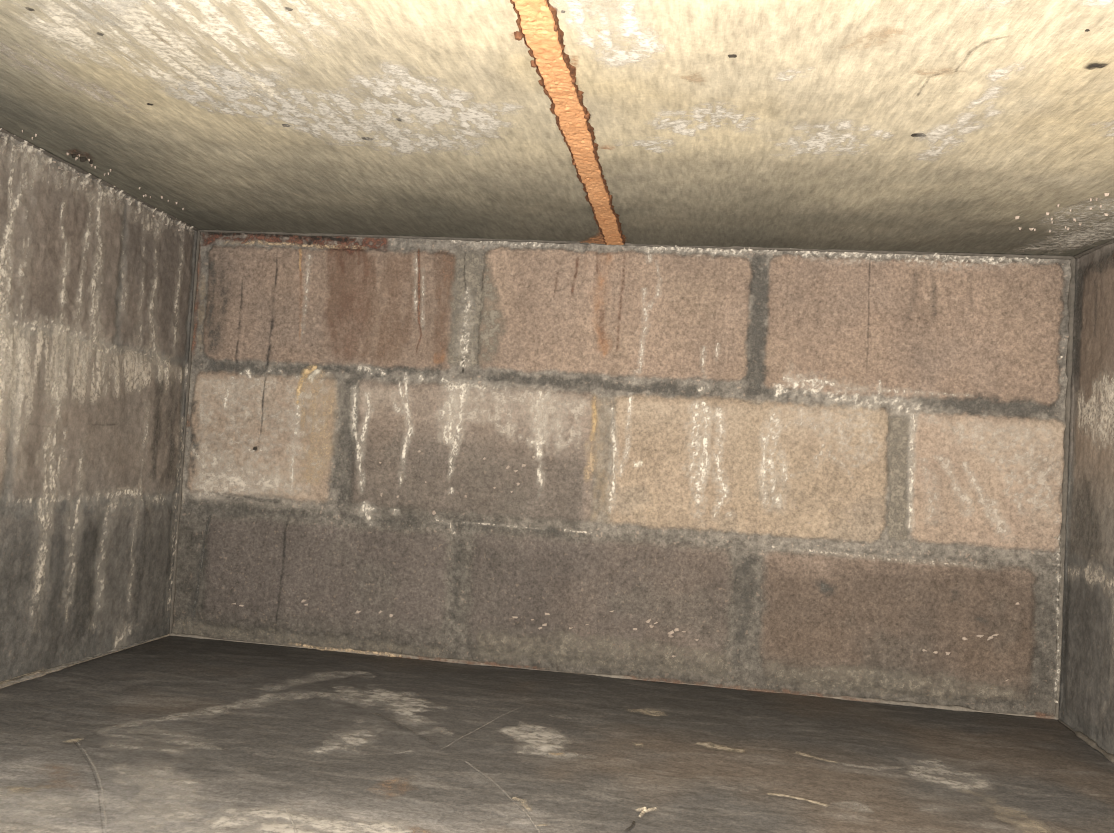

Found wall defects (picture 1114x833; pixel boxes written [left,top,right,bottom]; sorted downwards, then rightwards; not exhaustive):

leakage [647,245,752,260]
leakage [796,199,1114,265]
leakage [1072,253,1114,374]
leakage [0,128,385,595]
leakage [396,373,423,458]
leakage [447,382,596,485]
leakage [609,396,632,512]
leakage [690,387,727,517]
leakage [760,410,851,503]
leakage [775,377,967,413]
leakage [939,457,1006,533]
leakage [1077,375,1114,448]